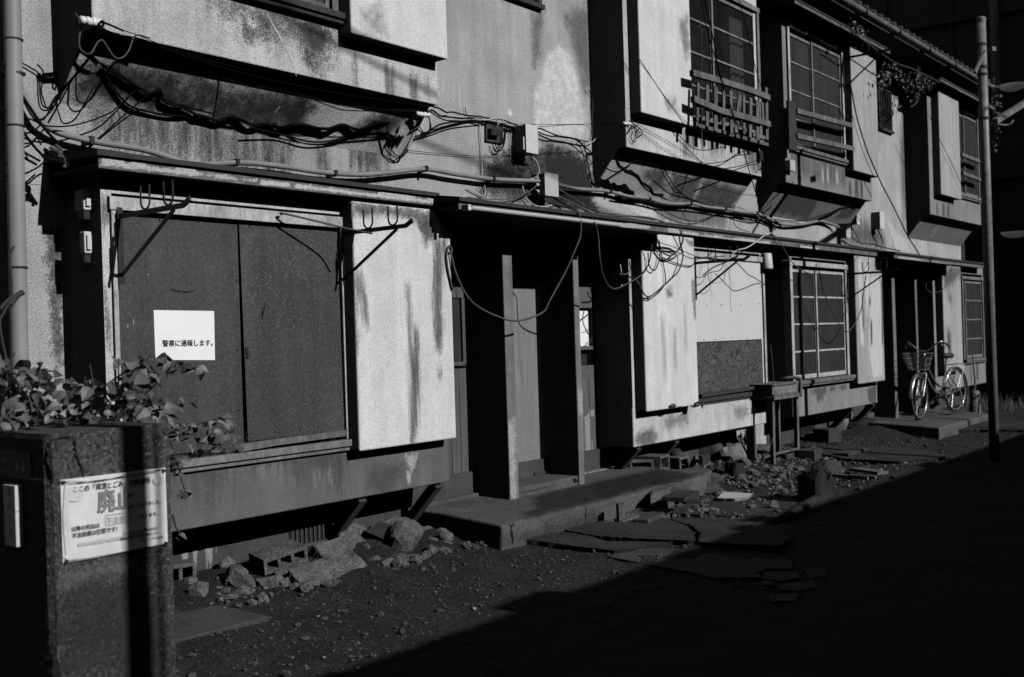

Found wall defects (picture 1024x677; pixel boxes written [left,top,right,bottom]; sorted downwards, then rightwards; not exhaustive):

leakage [210,0,340,78]
leakage [385,61,394,94]
leakage [477,11,612,214]
leakage [353,201,448,350]
leakage [369,289,420,493]